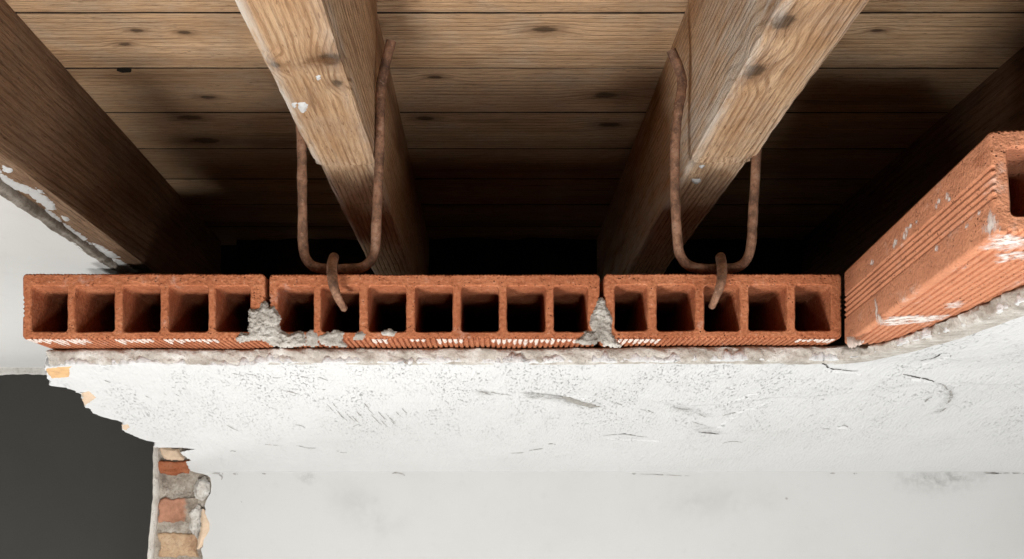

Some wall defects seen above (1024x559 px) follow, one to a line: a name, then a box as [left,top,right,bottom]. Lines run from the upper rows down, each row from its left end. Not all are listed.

flaking render [46,366,72,378]
flaking render [80,391,96,405]
crack [903,354,954,412]
flaking render [147,446,211,559]